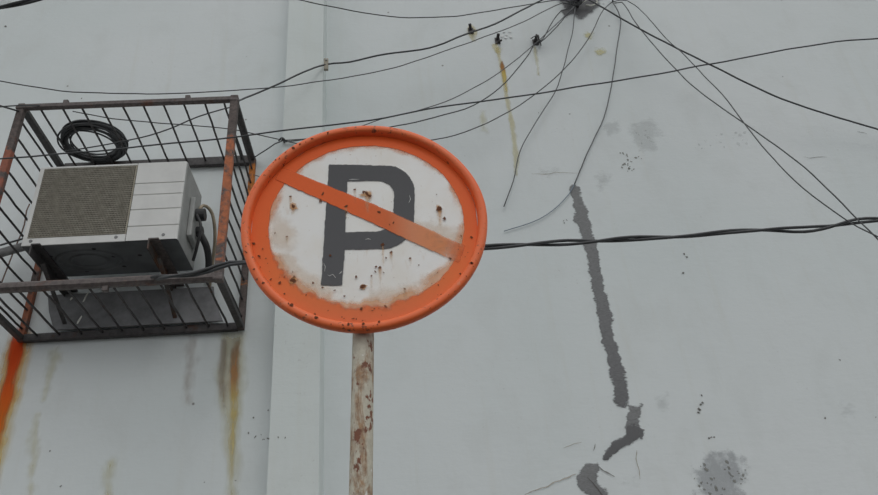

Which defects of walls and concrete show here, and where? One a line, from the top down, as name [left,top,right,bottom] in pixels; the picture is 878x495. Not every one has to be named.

corrosion [0,337,26,460]